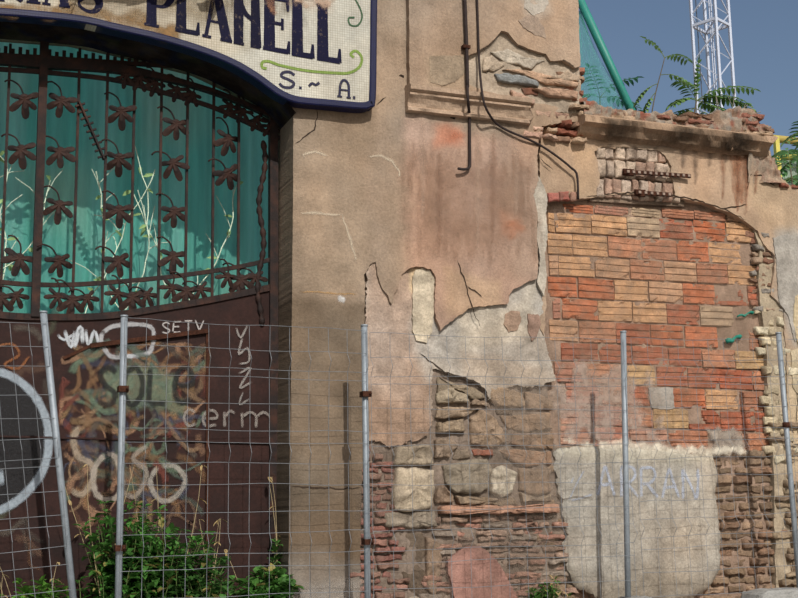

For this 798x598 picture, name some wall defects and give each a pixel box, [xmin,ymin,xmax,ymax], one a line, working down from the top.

spalling [469,32,580,114]
damp [707,133,752,154]
crack [458,262,482,326]
spalling [349,263,579,598]